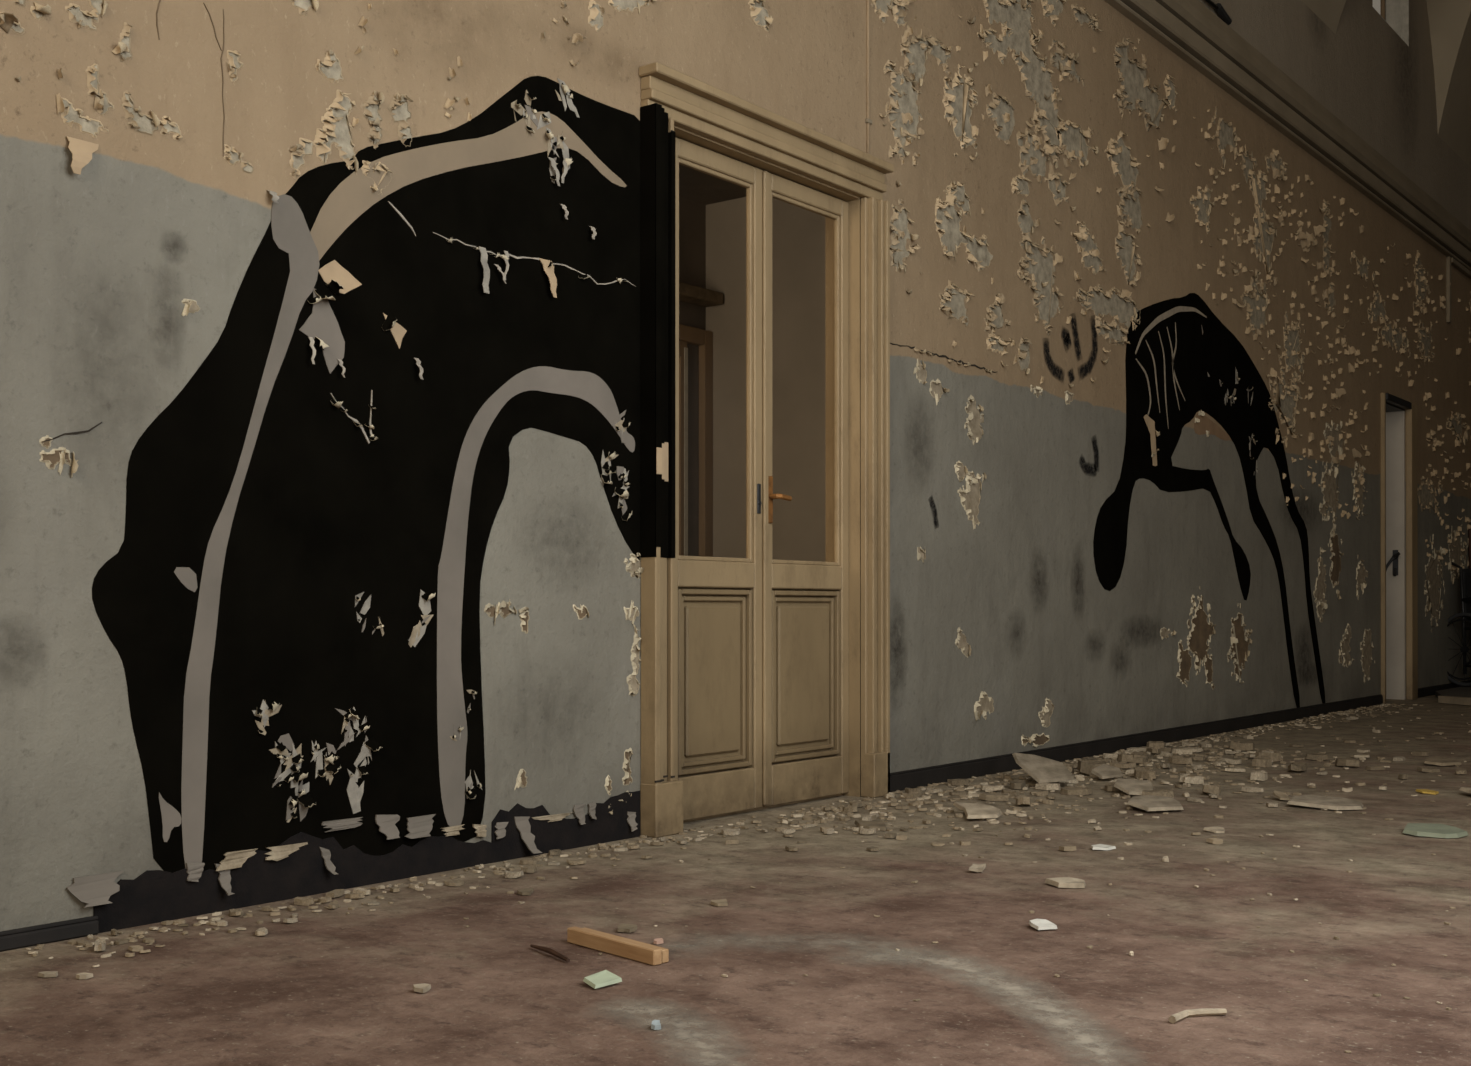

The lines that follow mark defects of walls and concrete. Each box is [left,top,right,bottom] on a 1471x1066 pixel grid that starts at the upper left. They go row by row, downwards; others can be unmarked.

peeling [56,64,183,175]
peeling [289,3,413,195]
peeling [511,78,580,186]
peeling [299,260,362,378]
peeling [382,313,424,380]
peeling [473,246,509,294]
peeling [539,258,557,298]
peeling [871,0,1471,632]
peeling [600,410,632,521]
peeling [355,592,384,636]
peeling [408,589,436,648]
flaking render [66,700,741,951]